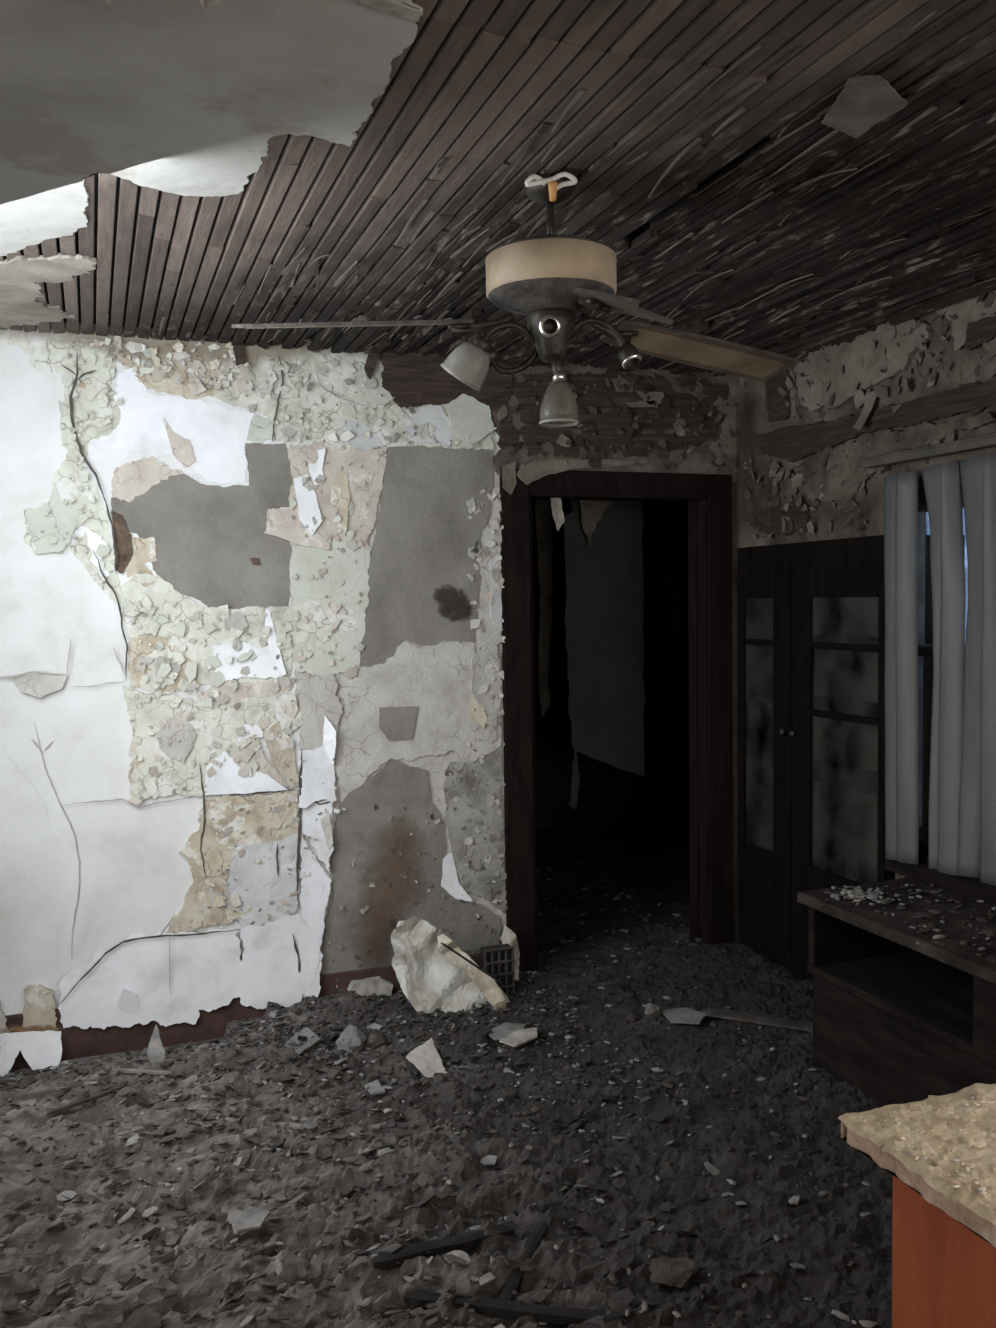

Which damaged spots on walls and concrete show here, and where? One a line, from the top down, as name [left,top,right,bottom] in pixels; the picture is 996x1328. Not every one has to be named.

crack [0,354,128,687]
damp [434,586,472,621]
flaking render [0,290,996,1077]
crack [32,724,330,941]
crack [60,915,240,1004]
crack [292,933,301,973]